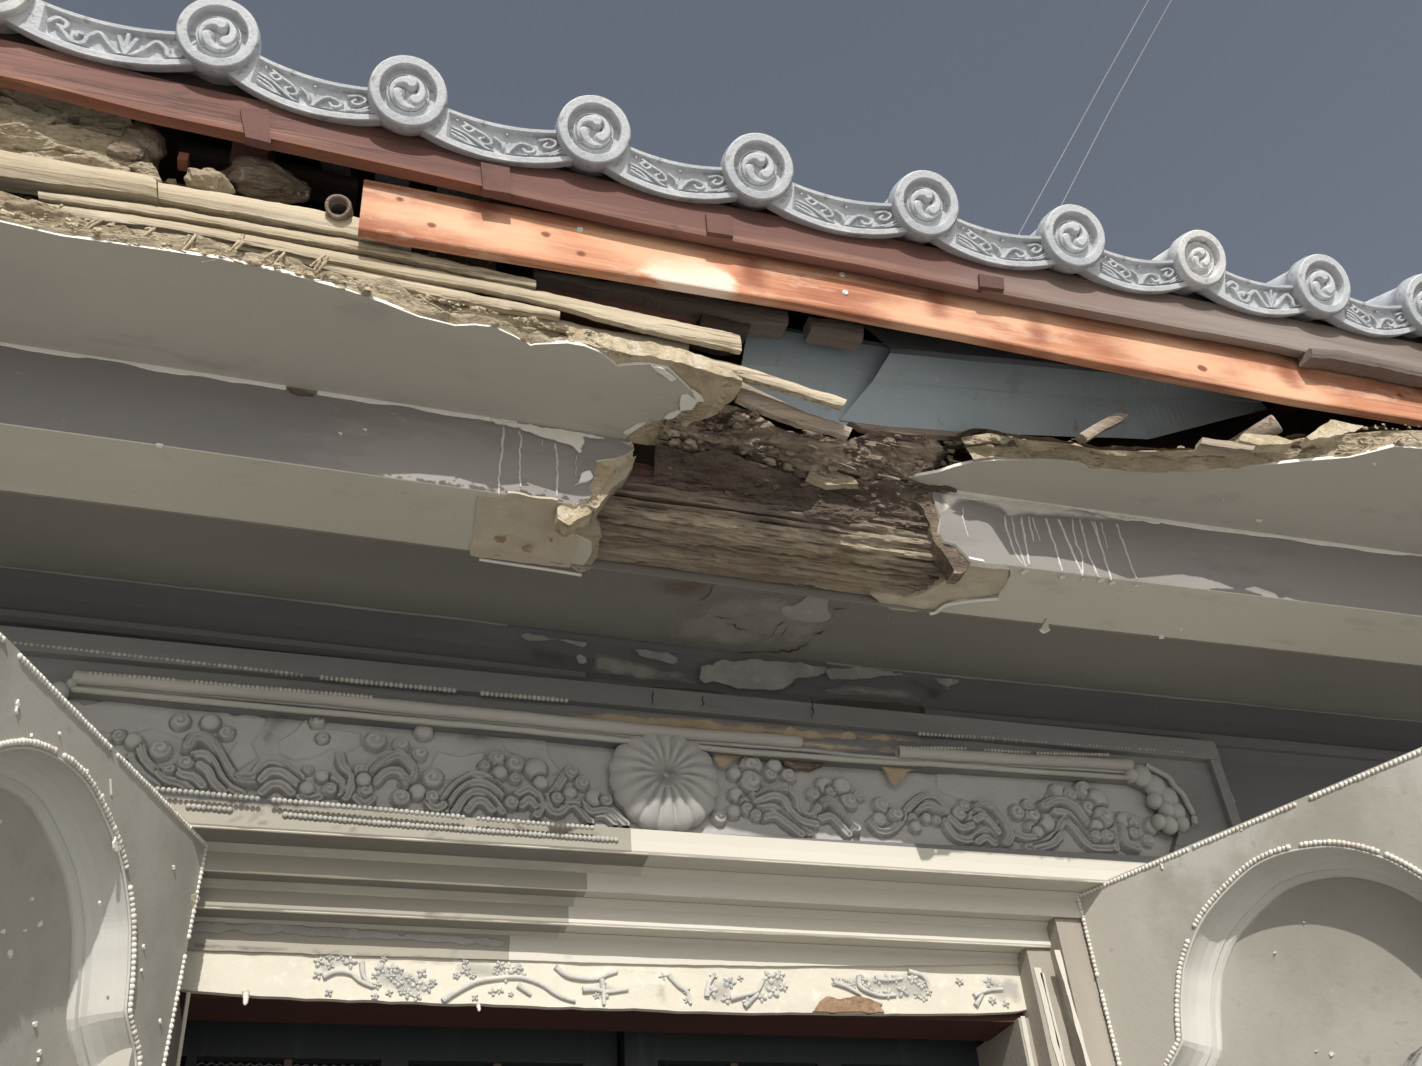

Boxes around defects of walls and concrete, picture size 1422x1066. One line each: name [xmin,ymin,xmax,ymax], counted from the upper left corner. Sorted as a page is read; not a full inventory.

spalling [0,87,190,201]
spalling [0,191,1422,626]
peeling [521,633,923,714]
spalling [813,996,884,1015]